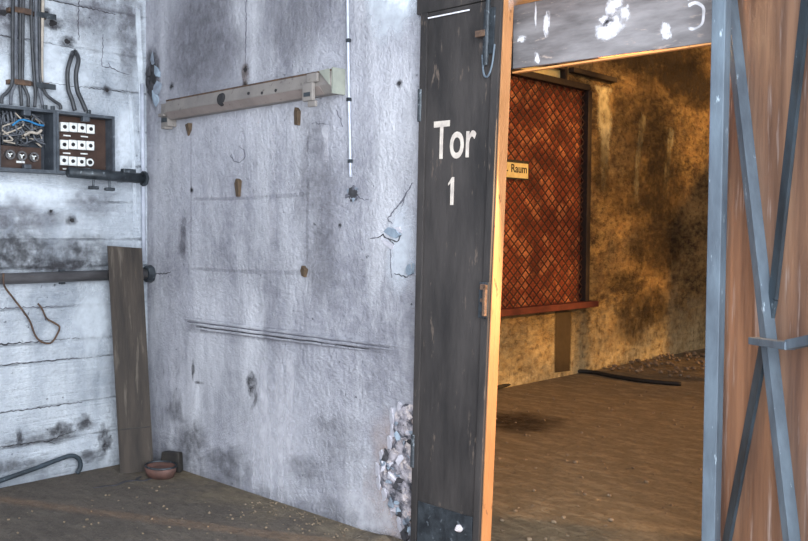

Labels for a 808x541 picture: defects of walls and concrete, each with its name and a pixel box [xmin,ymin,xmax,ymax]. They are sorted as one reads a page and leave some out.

damp [598,87,611,159]
crack [387,183,412,224]
damp [621,290,663,337]
flaking render [375,402,413,541]